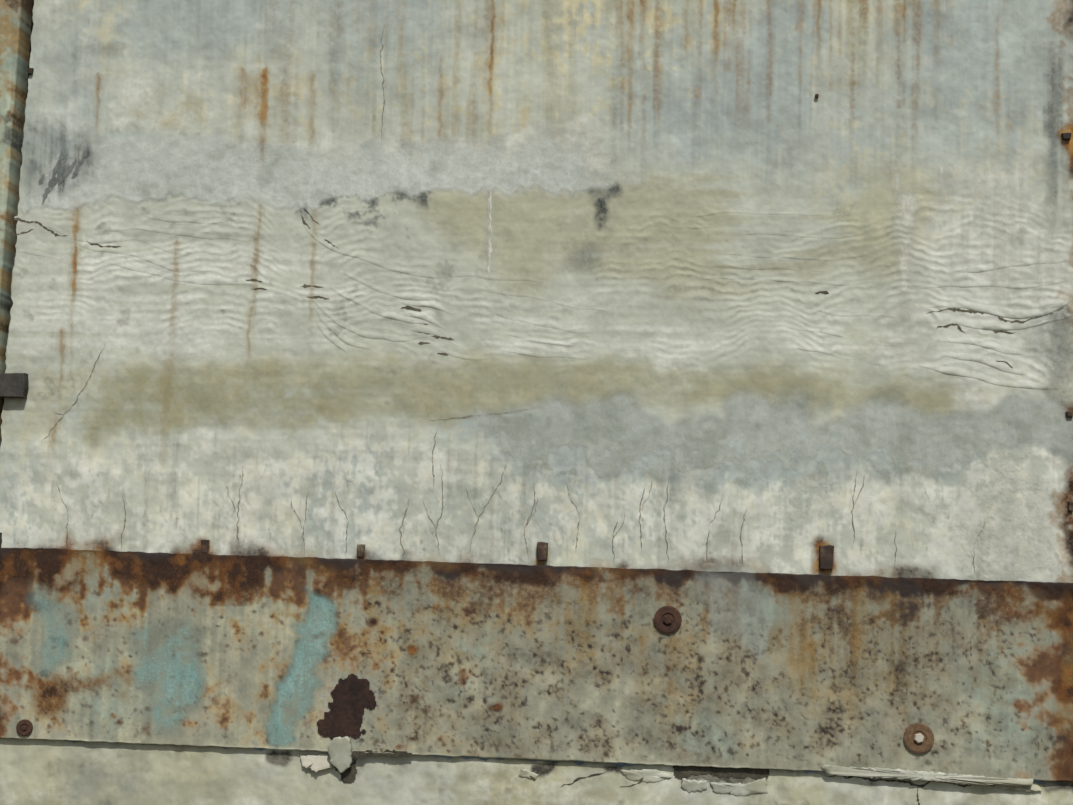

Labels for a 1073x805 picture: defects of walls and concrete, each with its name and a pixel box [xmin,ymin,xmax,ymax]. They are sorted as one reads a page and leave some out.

corrosion [259,68,268,124]
leakage [21,129,641,275]
crack [926,308,1063,334]
leakage [479,389,1073,481]
crack [399,408,530,556]
crack [612,482,669,564]
crack [851,474,865,544]
corrosion [0,538,287,606]
corrosion [764,573,801,593]
corrosion [813,539,862,595]
spalling [519,763,555,781]
spalling [605,766,769,796]